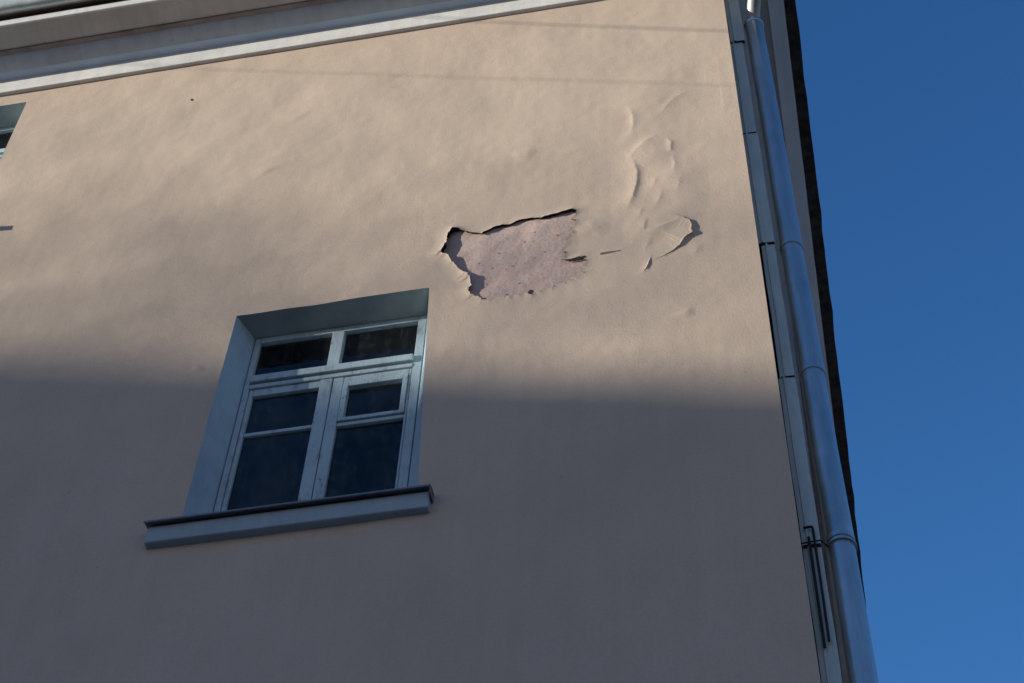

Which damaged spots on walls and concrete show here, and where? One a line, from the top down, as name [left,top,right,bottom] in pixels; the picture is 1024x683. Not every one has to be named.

peeling [426,204,599,307]